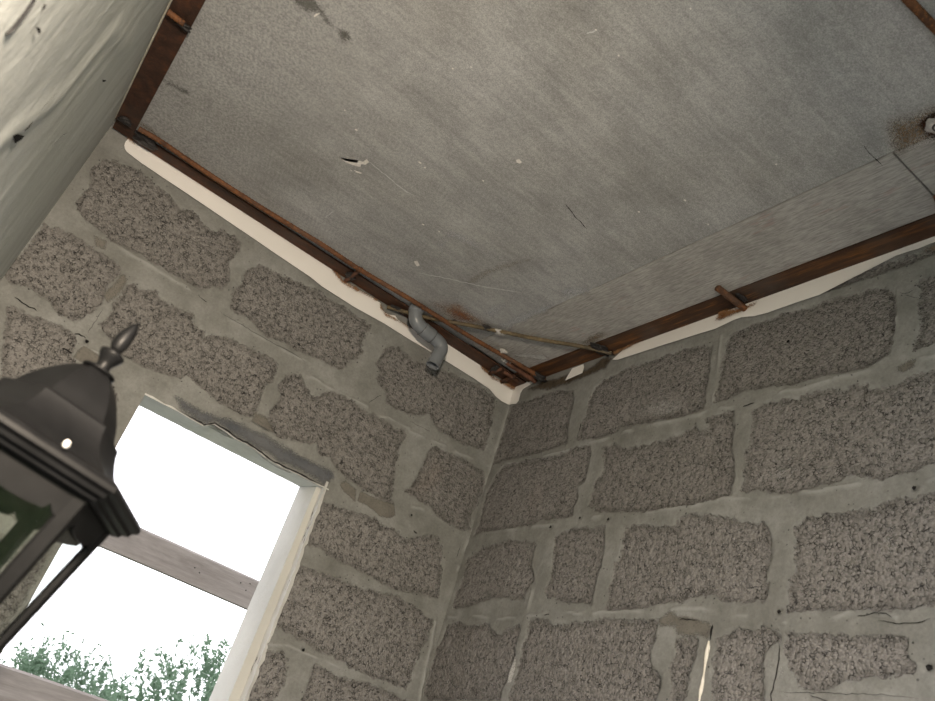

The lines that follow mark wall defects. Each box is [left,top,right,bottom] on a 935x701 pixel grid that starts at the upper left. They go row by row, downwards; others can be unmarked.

crack [5,0,47,36]
water stain [295,0,330,24]
corrosion [887,107,935,152]
crack [859,612,931,624]
crack [770,645,918,701]